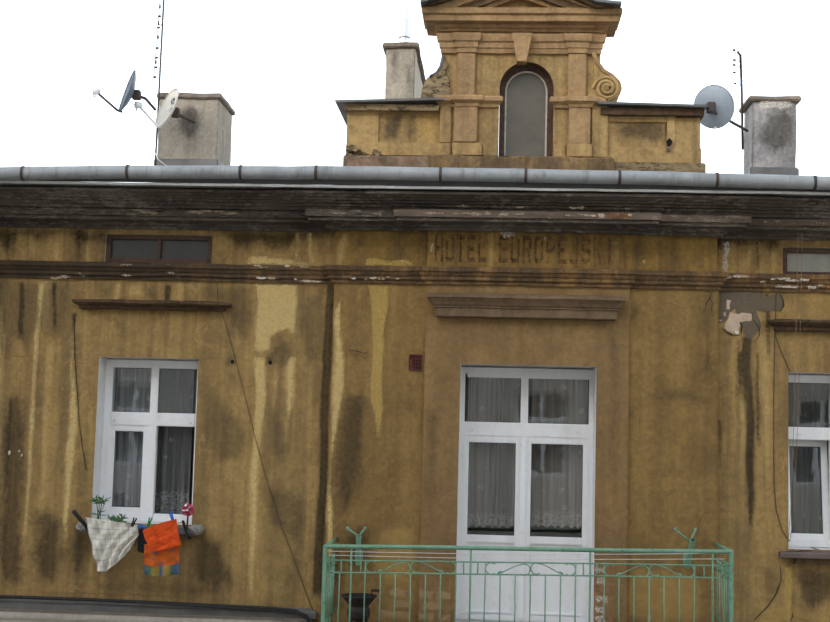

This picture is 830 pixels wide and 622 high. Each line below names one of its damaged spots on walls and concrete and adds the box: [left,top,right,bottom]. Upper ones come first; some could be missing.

water stain [2,400,34,578]
water stain [39,392,76,576]
water stain [250,359,265,564]
water stain [256,284,296,350]
water stain [313,285,361,598]
water stain [370,286,387,429]
flaking render [719,300,752,336]
water stain [738,338,759,524]